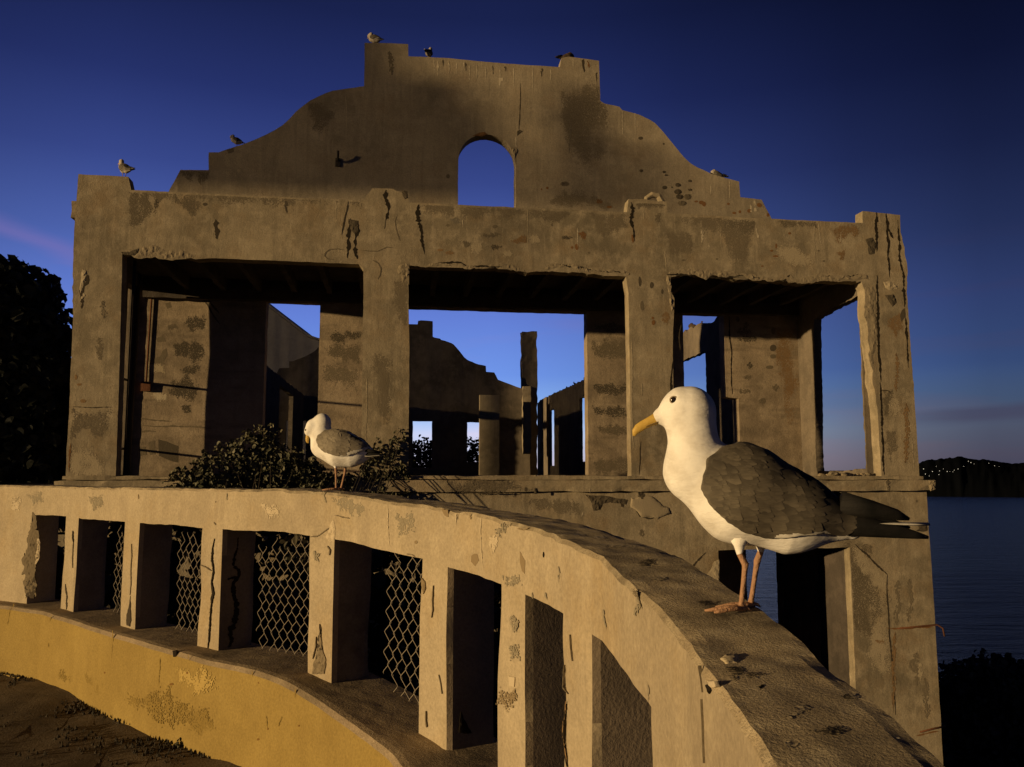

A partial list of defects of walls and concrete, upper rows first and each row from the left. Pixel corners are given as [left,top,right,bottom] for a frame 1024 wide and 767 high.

spalling [121,245,195,261]
crack [324,190,501,278]
crack [827,212,909,475]
spalling [21,512,41,598]
crack [201,522,241,648]
peeling [172,650,218,696]
spalling [312,625,326,674]